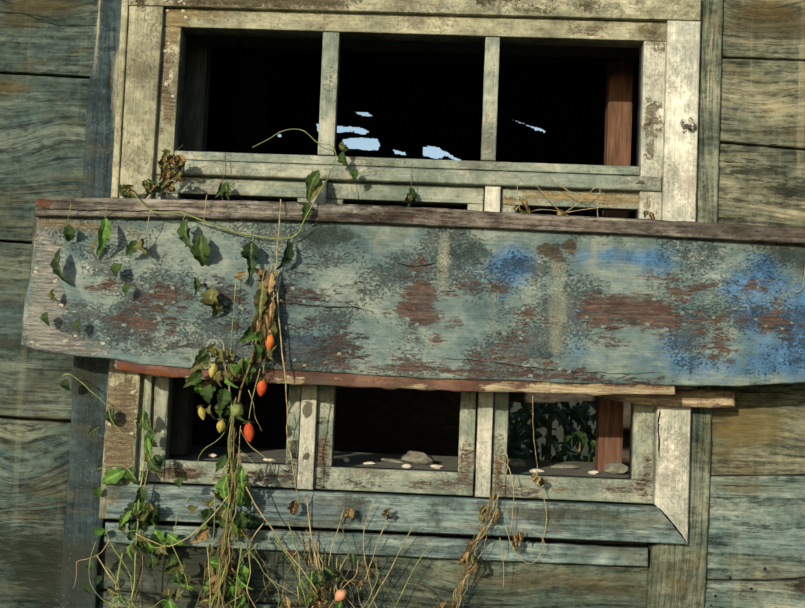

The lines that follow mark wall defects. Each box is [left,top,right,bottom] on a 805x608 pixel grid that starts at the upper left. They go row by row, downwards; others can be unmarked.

peeling [476,0,559,15]
peeling [574,0,600,15]
peeling [635,22,665,57]
peeling [642,96,664,160]
peeling [23,217,255,479]
peeling [261,254,598,385]
peeling [572,270,805,367]
peeling [149,461,222,484]